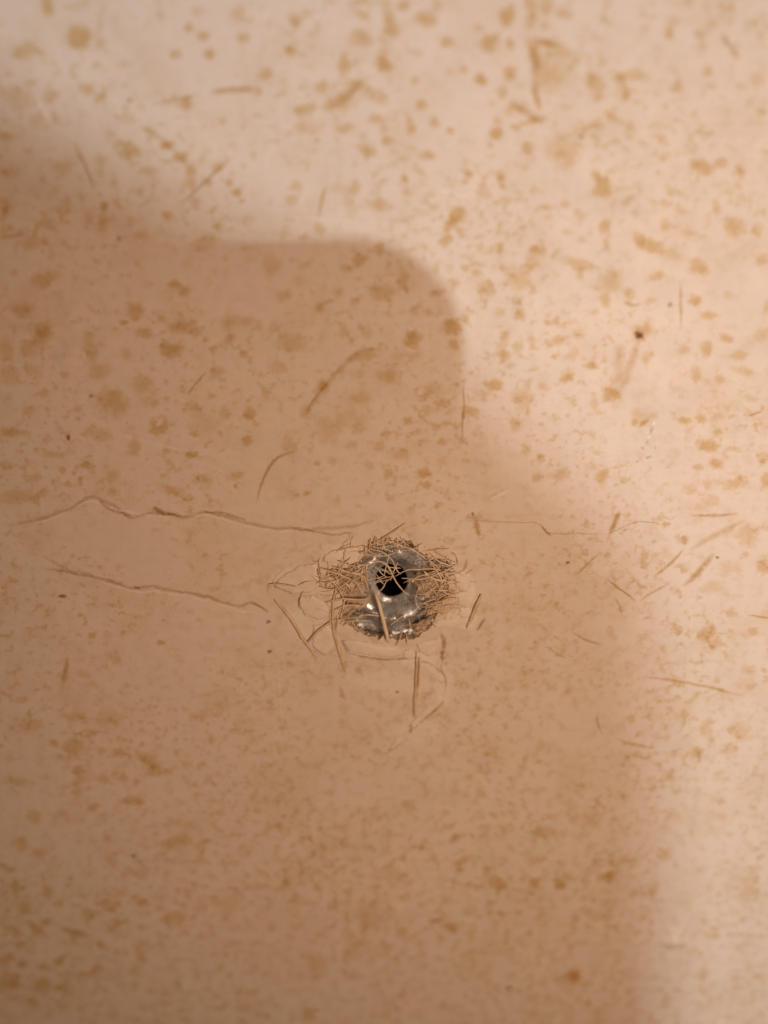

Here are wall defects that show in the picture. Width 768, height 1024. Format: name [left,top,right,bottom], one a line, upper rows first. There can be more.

crack [94,579,266,615]